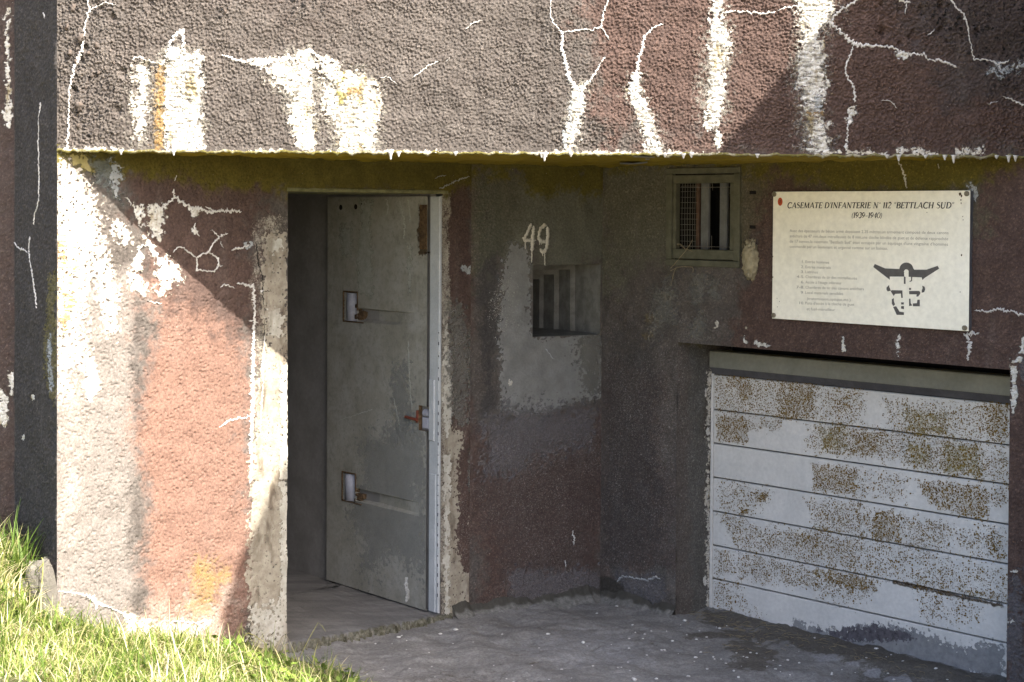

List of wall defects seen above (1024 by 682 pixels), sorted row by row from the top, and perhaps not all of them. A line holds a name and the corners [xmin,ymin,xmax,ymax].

crack [549,0,609,92]
crack [628,23,663,93]
crack [722,0,1024,151]
crack [14,102,41,308]
leakage [47,0,1024,414]
crack [162,175,270,484]
peeling [241,228,288,653]
leakage [471,392,601,492]
rust [714,374,1010,629]